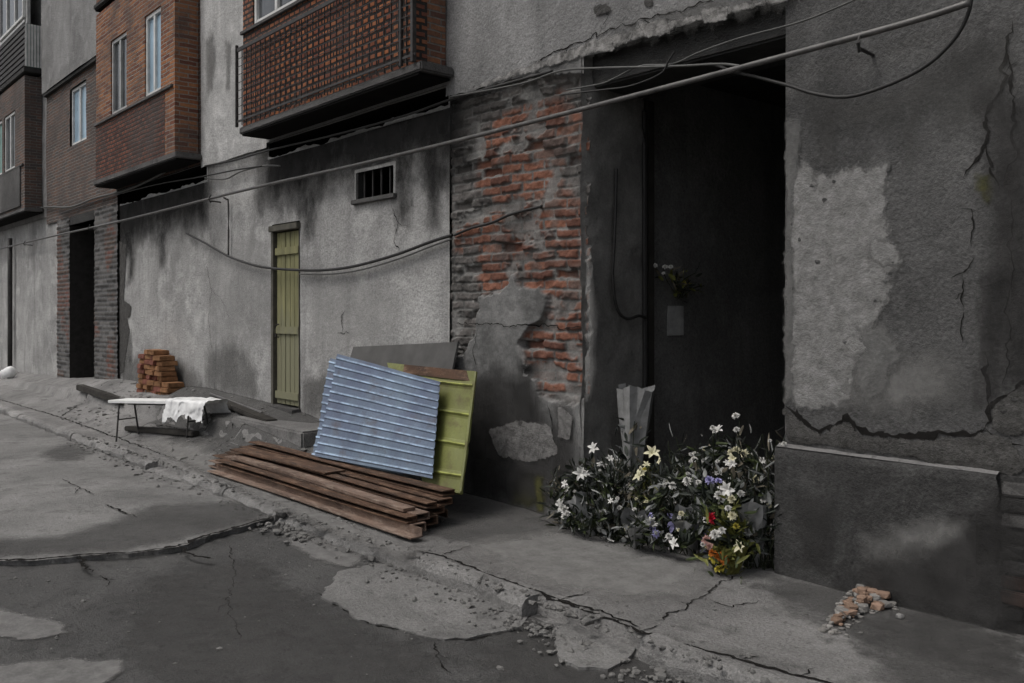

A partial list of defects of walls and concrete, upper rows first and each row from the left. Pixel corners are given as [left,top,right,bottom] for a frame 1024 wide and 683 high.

spalling [468,0,786,90]
crack [964,21,1019,181]
crack [951,208,977,342]
flaking render [782,119,1024,623]
crack [786,348,1024,446]
crack [0,516,273,586]
crack [416,530,758,635]
crack [686,644,832,683]